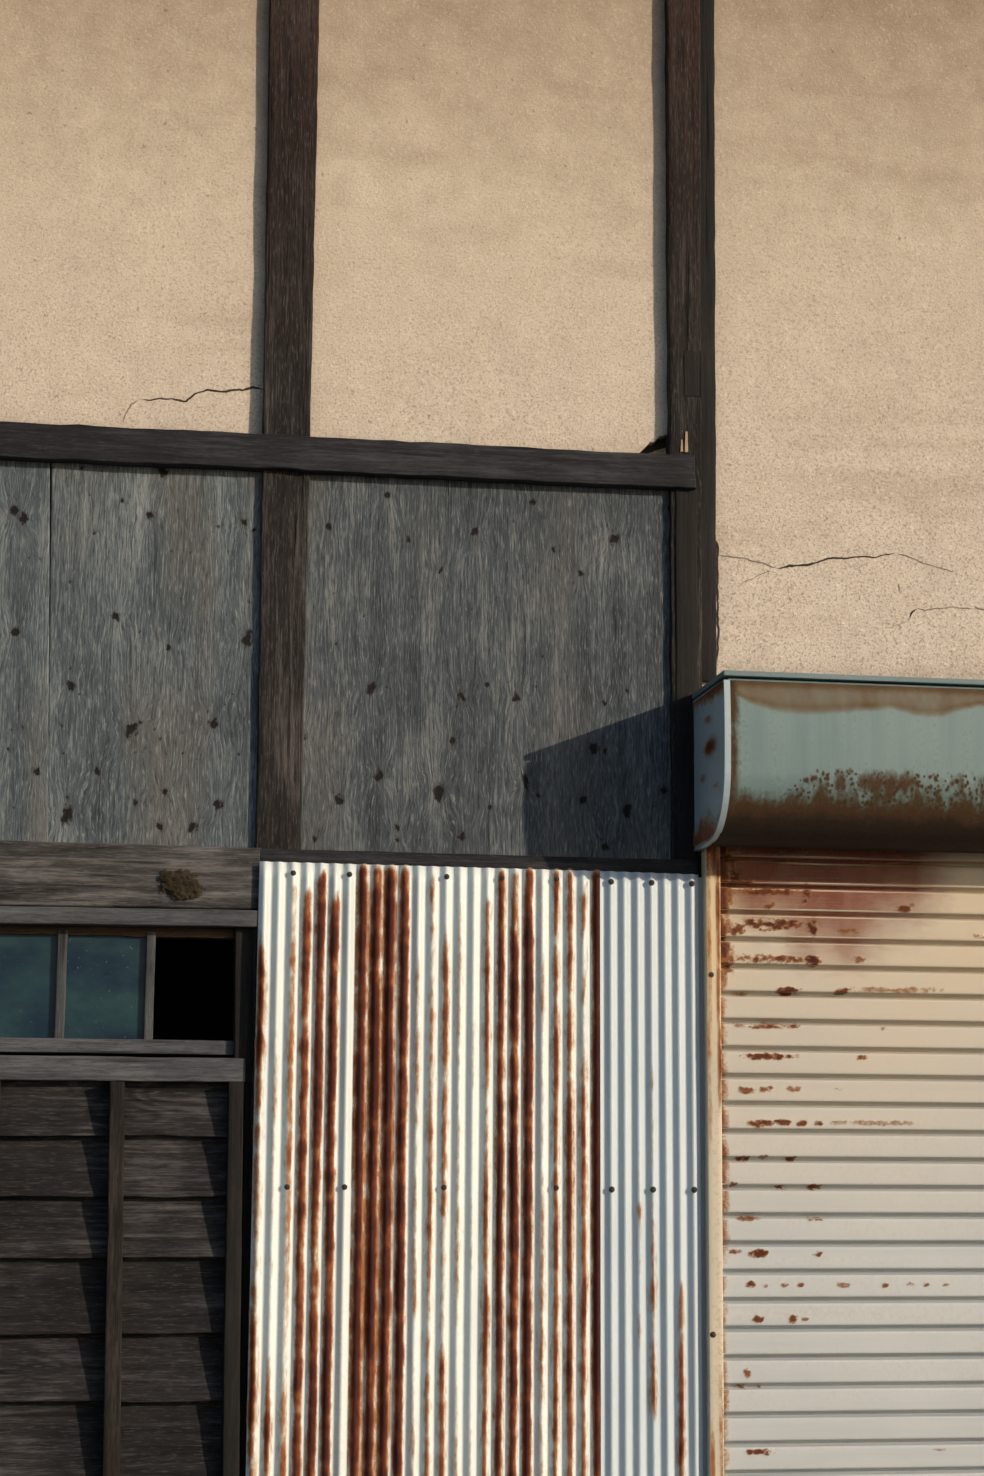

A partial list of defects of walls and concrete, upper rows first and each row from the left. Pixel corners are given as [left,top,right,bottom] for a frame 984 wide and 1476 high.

crack [123,386,261,422]
crack [716,540,984,662]
rust [692,681,723,755]
rust [693,769,984,1258]
rust [247,864,461,1476]
rust [480,867,601,1476]
rust [638,1204,655,1316]
rust [639,1326,657,1416]
rust [677,1284,685,1476]
rust [711,1312,760,1476]